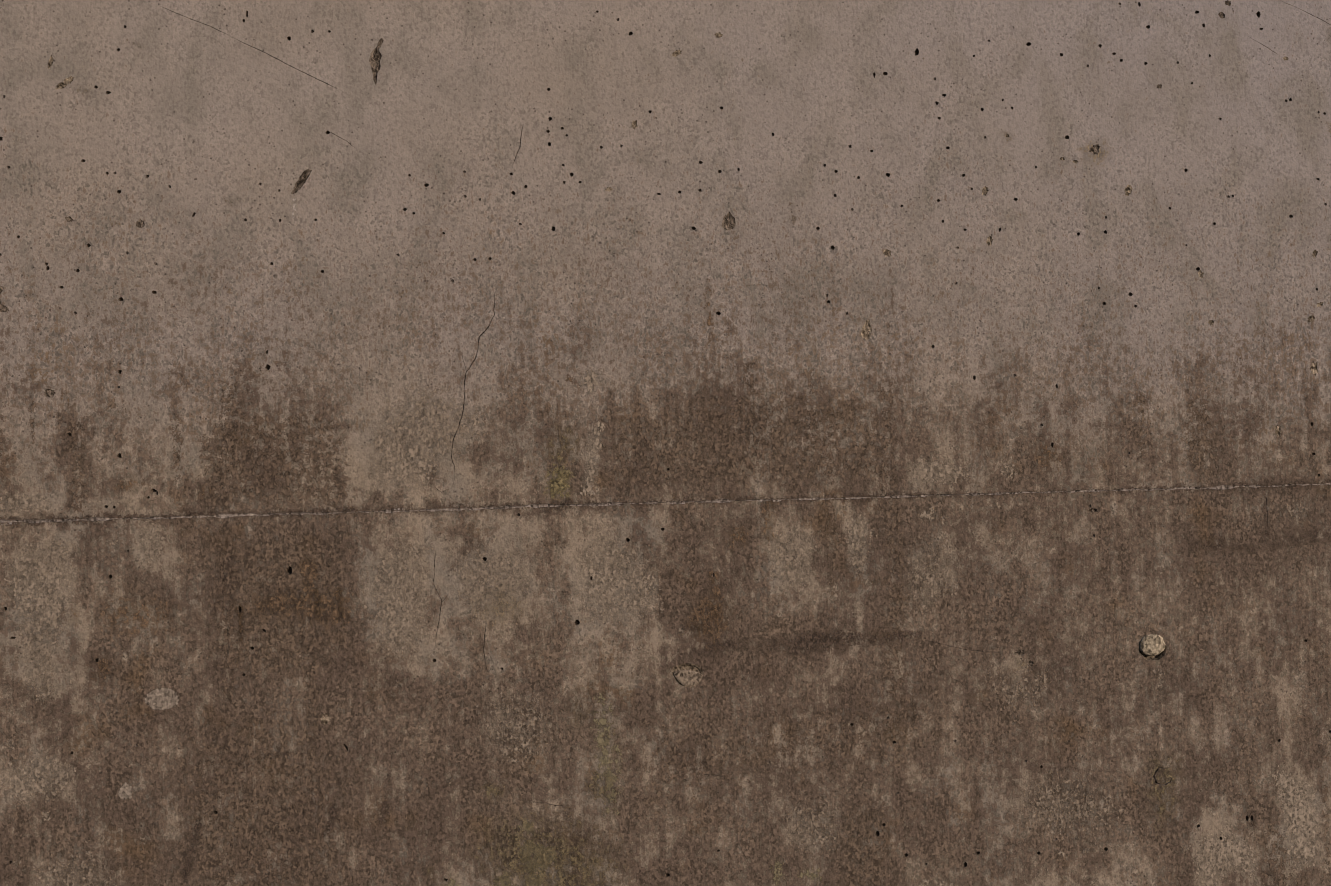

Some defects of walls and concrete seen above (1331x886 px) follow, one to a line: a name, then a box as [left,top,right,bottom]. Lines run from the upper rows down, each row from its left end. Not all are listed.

damp [155,381,389,886]
crack [436,294,495,493]
damp [601,362,948,886]
damp [1247,776,1331,886]